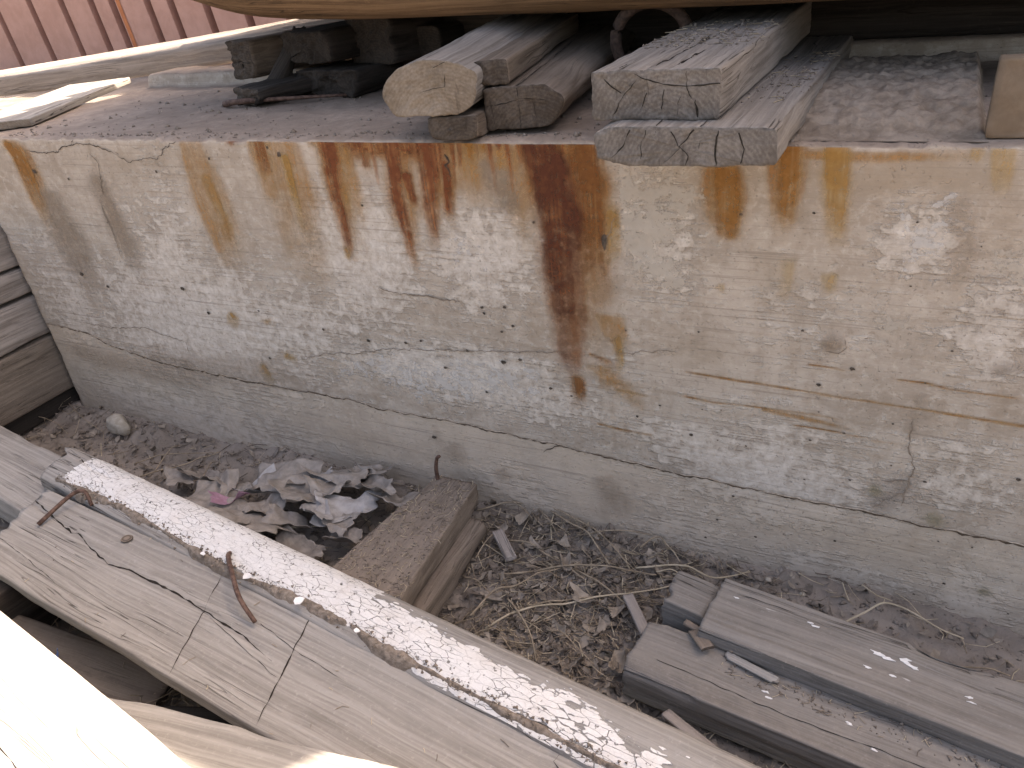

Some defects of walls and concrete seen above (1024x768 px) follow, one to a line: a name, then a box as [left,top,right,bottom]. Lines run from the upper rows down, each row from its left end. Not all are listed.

corrosion [3,141,45,207]
corrosion [181,144,227,251]
corrosion [248,141,314,208]
corrosion [703,166,746,238]
corrosion [768,146,934,231]
corrosion [308,142,629,392]
crack [46,323,1024,547]
corrosion [572,376,585,398]
corrosion [750,406,837,432]